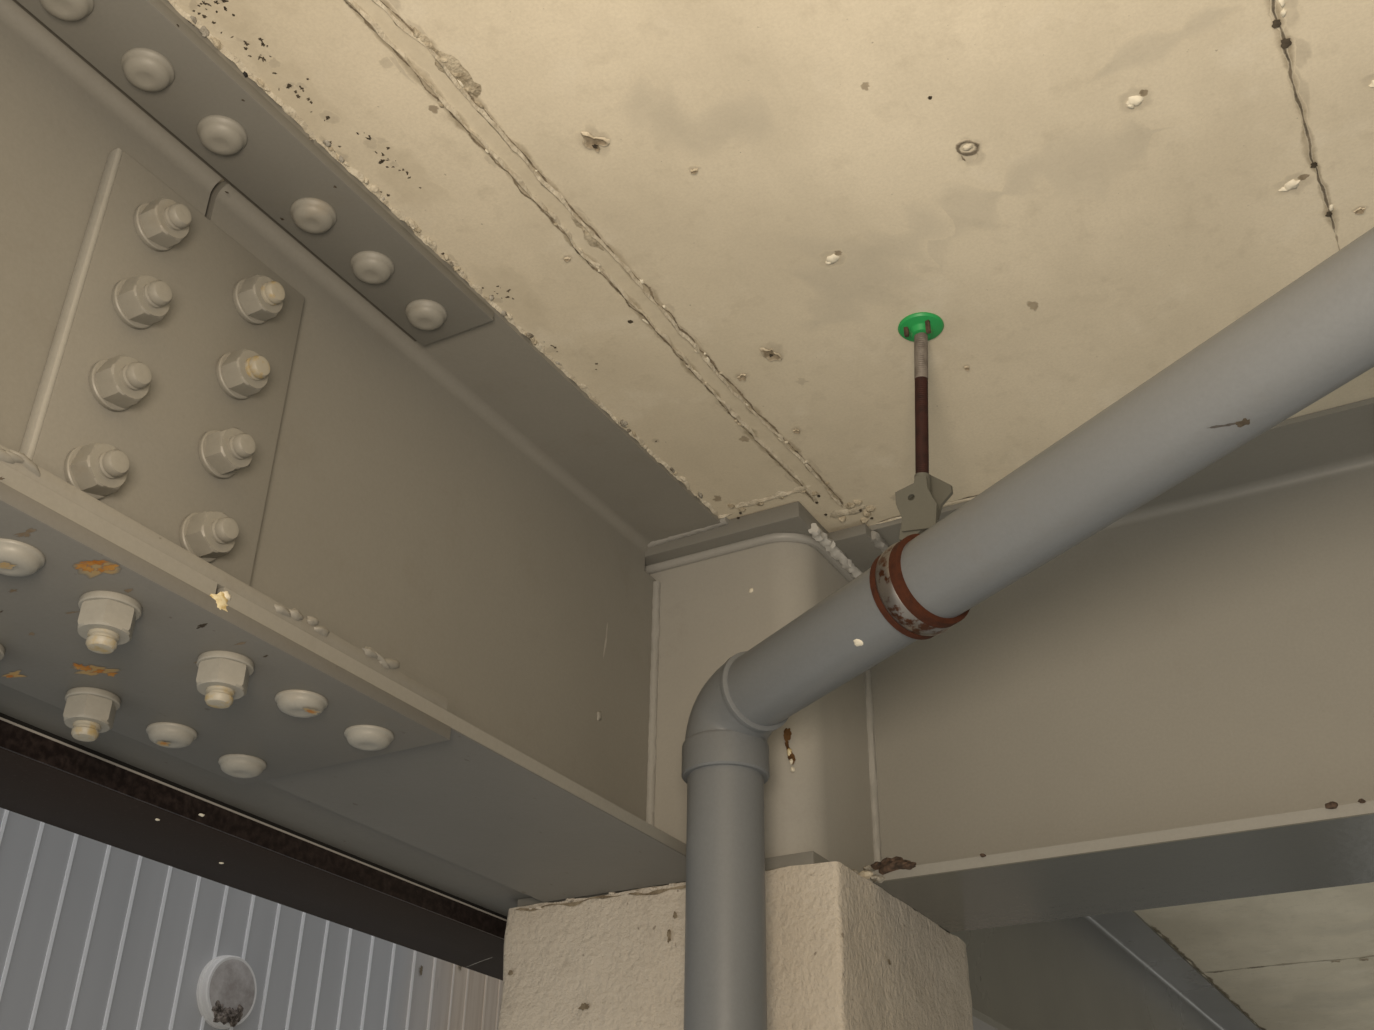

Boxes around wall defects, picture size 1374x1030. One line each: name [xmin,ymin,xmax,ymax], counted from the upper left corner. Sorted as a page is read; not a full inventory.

crack [1262,0,1340,250]
spalling [168,0,735,516]
corrosion [70,663,121,677]
corrosion [72,560,121,579]